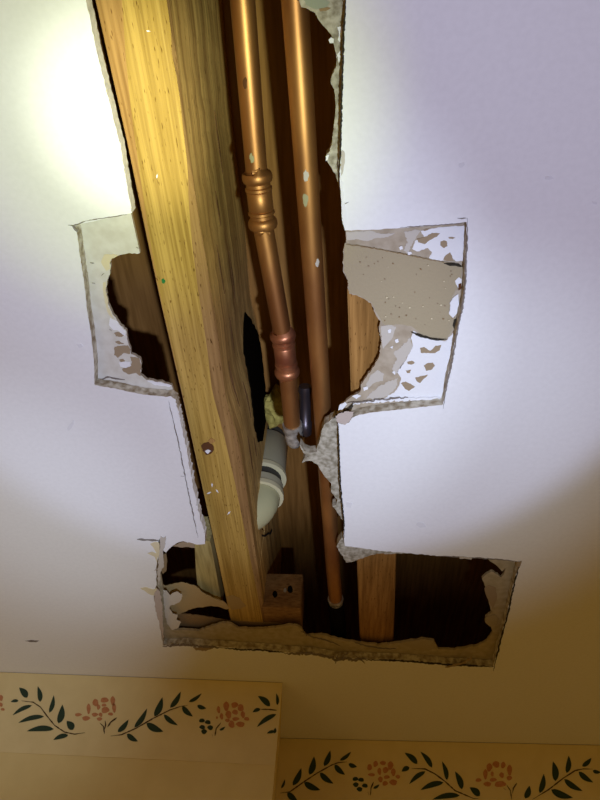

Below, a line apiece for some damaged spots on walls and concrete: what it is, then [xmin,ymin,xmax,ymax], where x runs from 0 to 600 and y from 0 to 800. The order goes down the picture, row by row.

peeling [449,277,462,318]
spalling [336,386,368,425]
spalling [141,536,166,645]